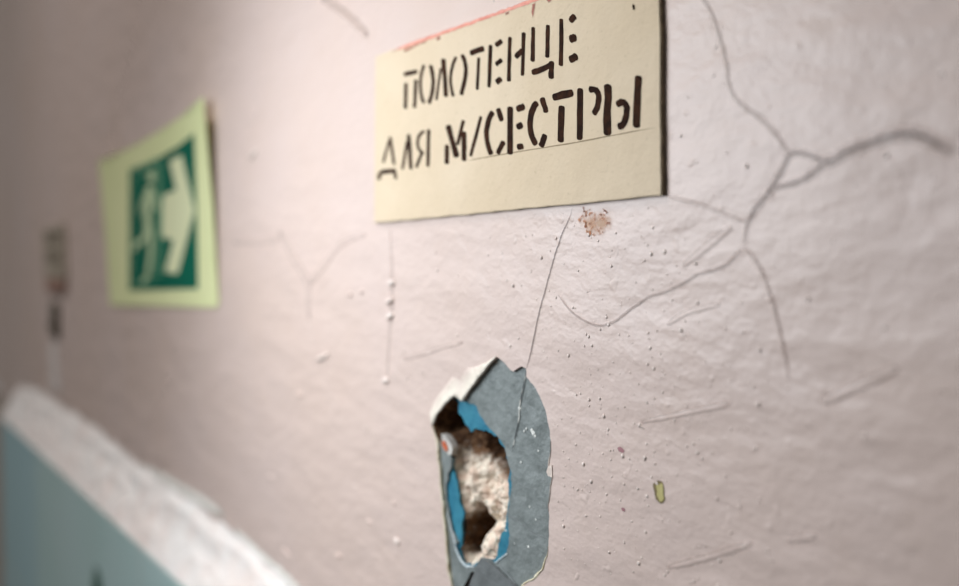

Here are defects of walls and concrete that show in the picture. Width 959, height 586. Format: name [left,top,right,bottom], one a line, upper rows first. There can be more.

crack [528,0,946,376]
peeling [430,357,553,586]